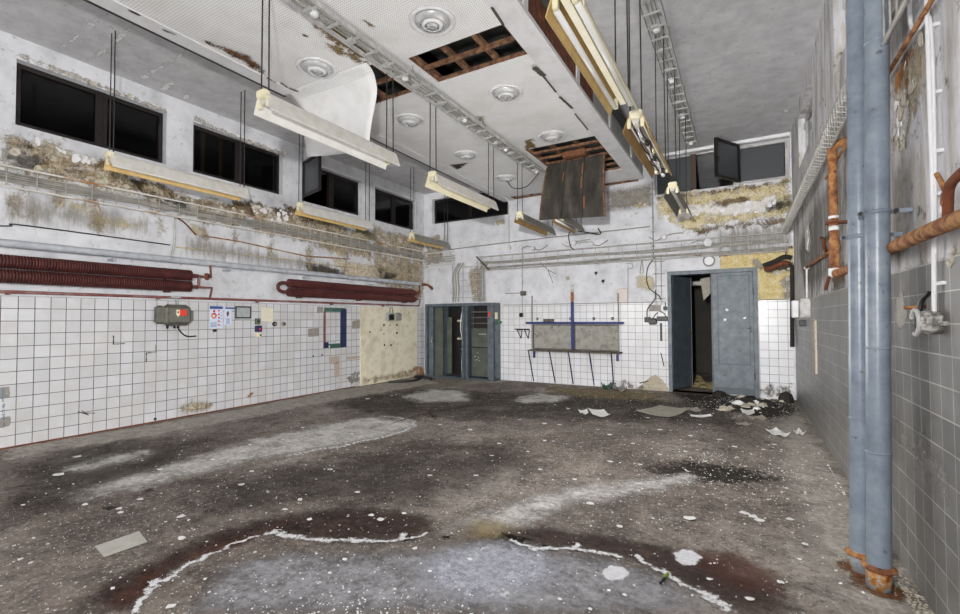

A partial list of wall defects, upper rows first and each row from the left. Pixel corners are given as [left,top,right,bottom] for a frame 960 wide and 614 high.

peeling [891,30,926,150]
spalling [194,116,284,157]
peeling [0,137,292,224]
peeling [633,179,792,231]
corrosion [934,168,960,217]
peeling [753,259,793,299]
corrosion [837,561,914,601]